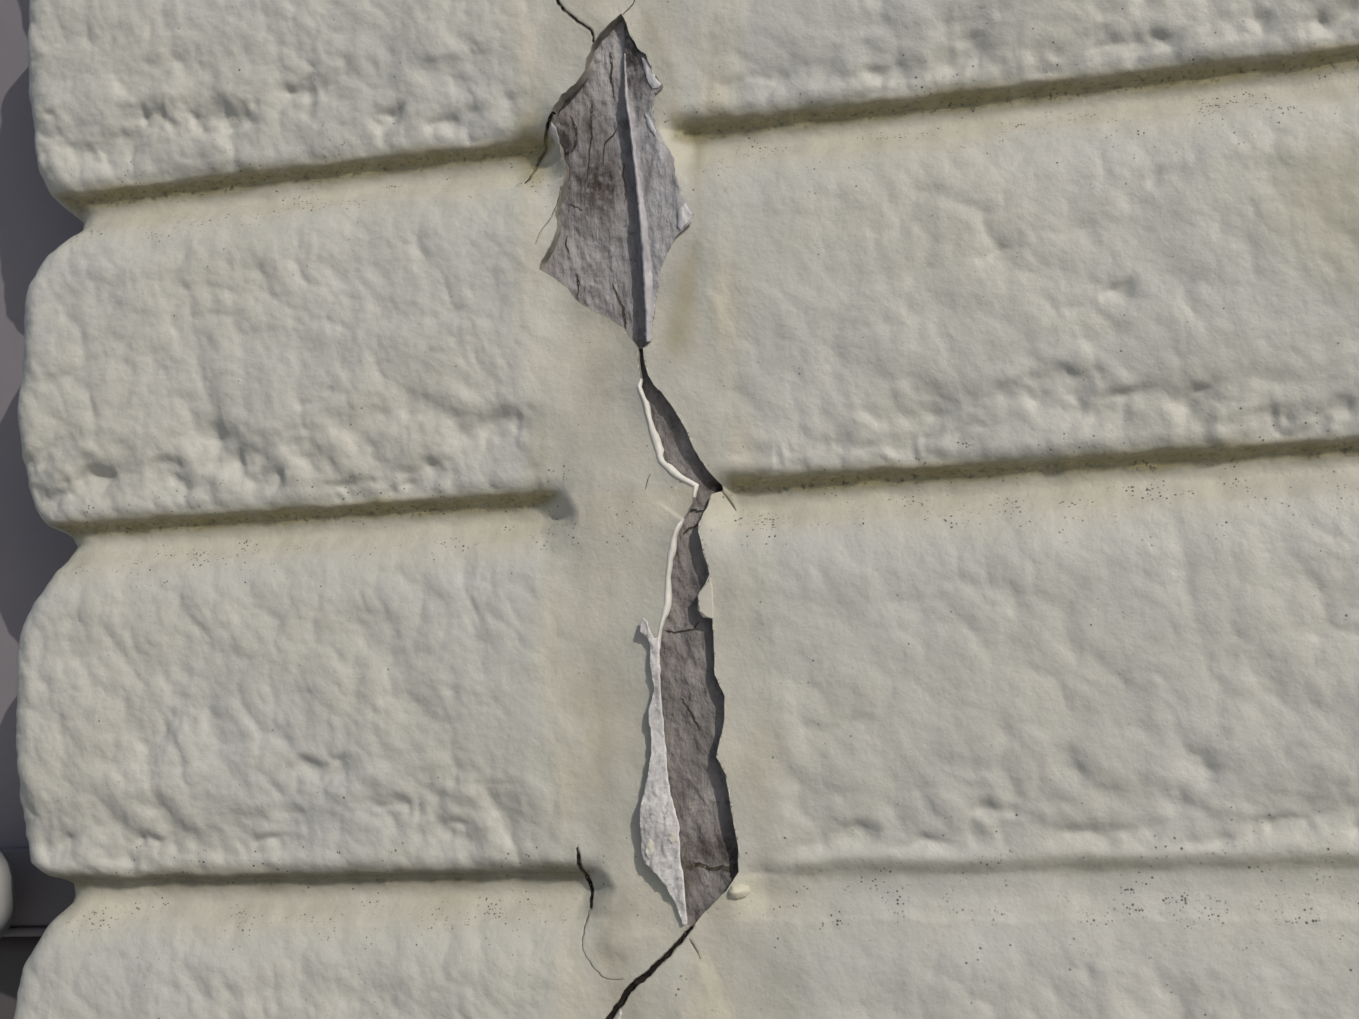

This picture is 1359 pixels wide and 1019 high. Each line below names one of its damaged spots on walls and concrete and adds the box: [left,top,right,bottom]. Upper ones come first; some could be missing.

crack [556,0,594,42]
crack [519,112,561,242]
peeling [539,13,739,927]
crack [577,847,701,1019]